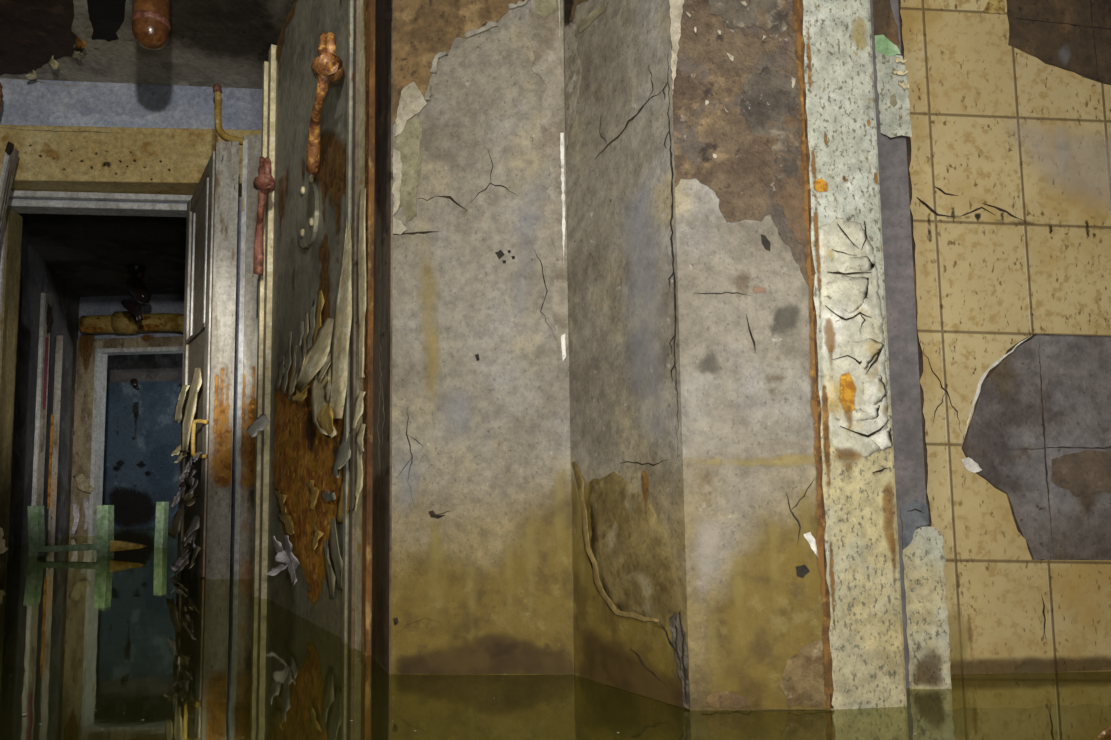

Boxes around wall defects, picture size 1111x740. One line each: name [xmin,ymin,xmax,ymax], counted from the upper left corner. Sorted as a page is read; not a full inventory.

corrosion [214,367,256,487]
corrosion [302,132,347,324]
water stain [375,0,391,242]
crack [394,229,439,237]
crack [418,151,519,211]
crack [595,64,756,466]
peeling [670,0,809,286]
corrosion [793,0,860,708]
peeling [962,334,1111,560]
peeling [983,0,1111,84]
water stain [372,475,690,710]
water stain [716,517,830,709]